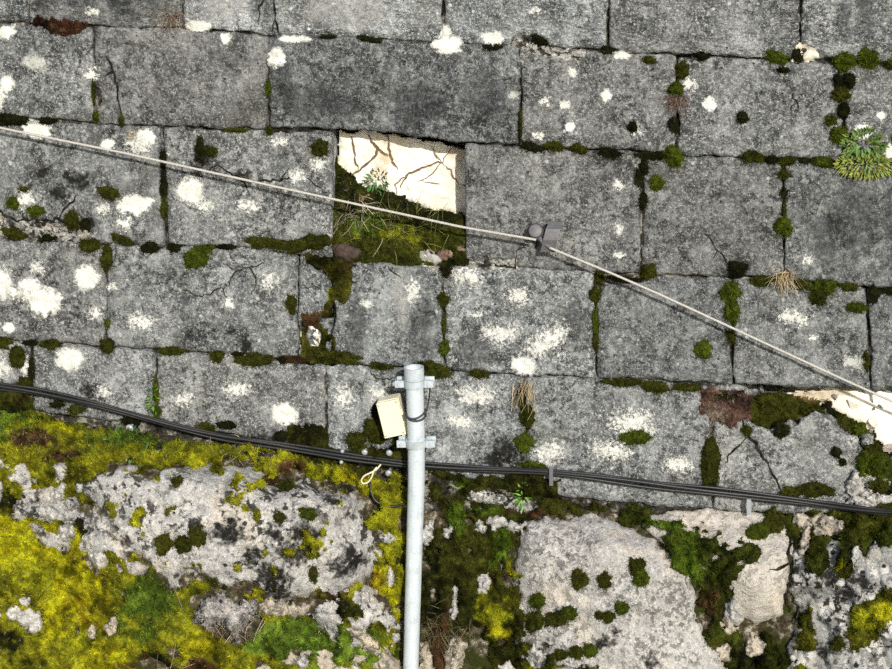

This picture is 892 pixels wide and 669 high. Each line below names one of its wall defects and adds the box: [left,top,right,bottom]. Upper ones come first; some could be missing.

crack [258,0,281,36]
spalling [338,130,466,216]
crack [351,135,465,190]
crack [725,419,782,491]
spalling [788,387,892,457]